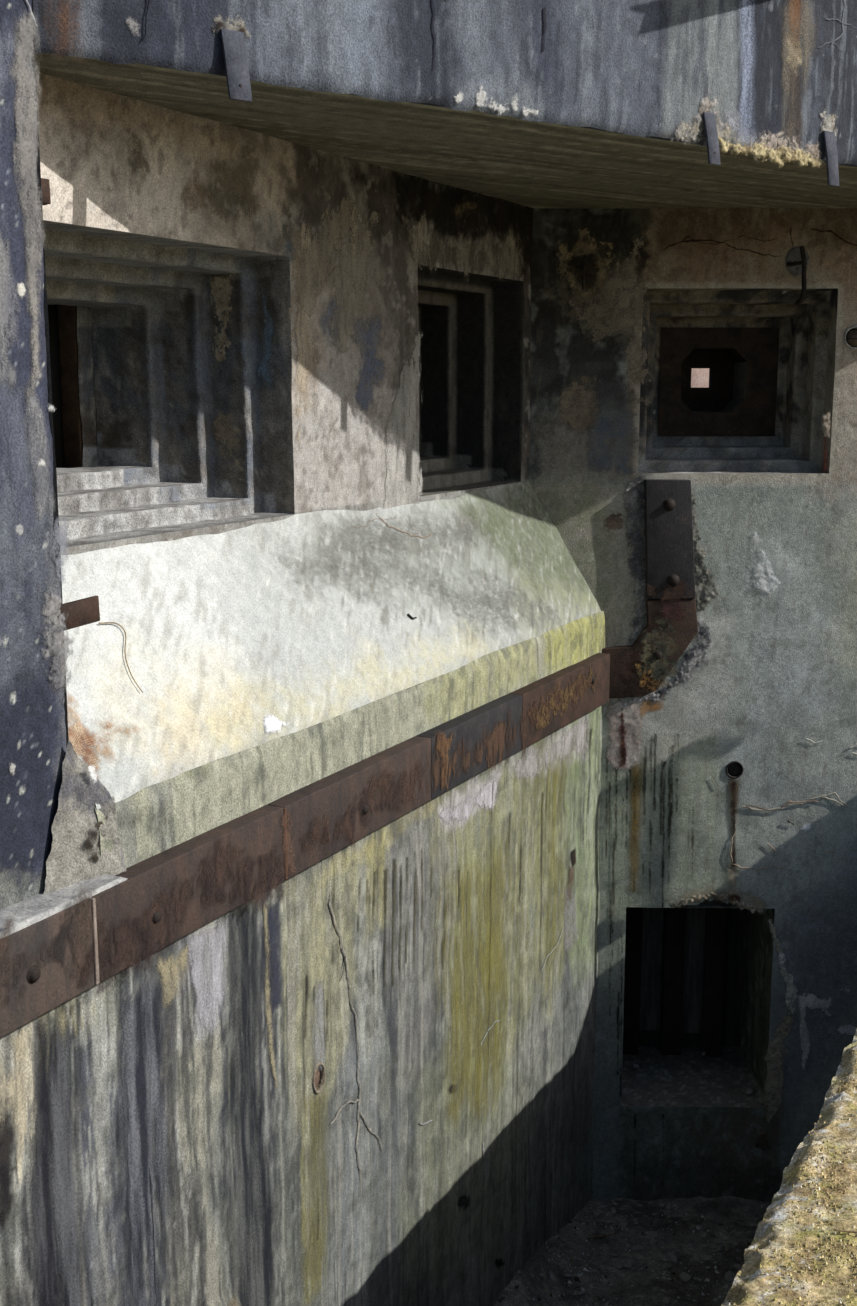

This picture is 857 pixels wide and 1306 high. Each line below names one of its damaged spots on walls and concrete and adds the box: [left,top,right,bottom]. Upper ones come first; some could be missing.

spalling [676,97,838,168]
peeling [634,618,681,692]
rust [0,710,526,1003]
leakage [357,848,432,993]
rust [564,848,577,949]
rust [605,697,663,890]
leakage [305,975,329,1066]
leakage [0,1023,84,1306]
leakage [119,903,282,1306]